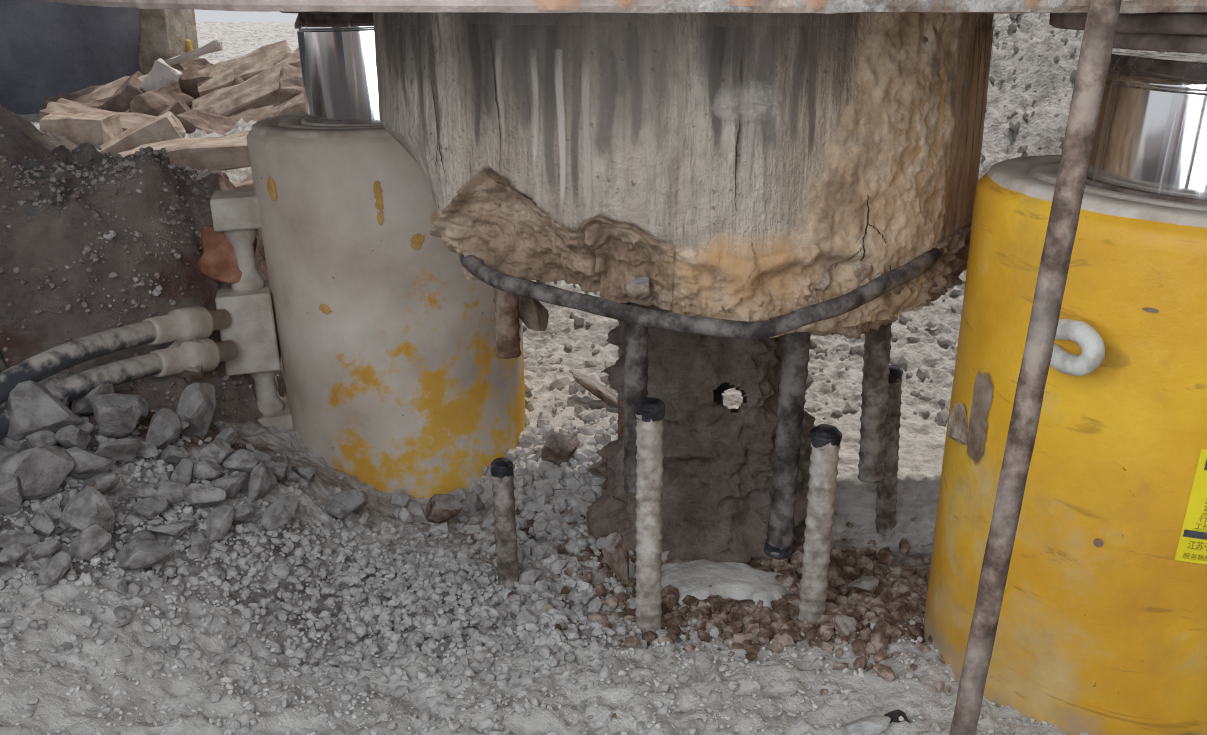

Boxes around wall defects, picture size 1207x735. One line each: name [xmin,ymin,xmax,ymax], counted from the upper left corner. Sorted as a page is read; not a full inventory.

leakage [386,12,439,142]
leakage [463,12,641,207]
corrosion [537,0,577,10]
leakage [705,13,783,184]
leakage [791,13,814,145]
spalling [410,13,972,633]